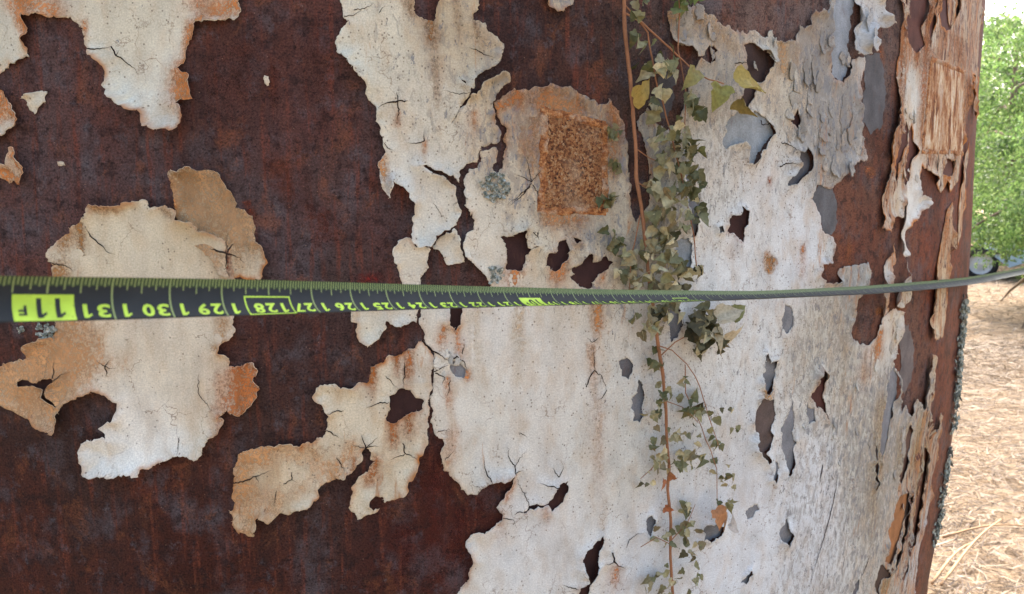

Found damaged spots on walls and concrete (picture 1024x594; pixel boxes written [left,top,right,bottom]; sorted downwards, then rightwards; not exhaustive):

crack [86,46,137,73]
peeling [0,0,241,136]
corrosion [174,60,192,101]
corrosion [899,4,944,123]
peeling [46,166,268,280]
corrosion [163,167,258,275]
peeling [229,0,985,594]
peeling [0,316,258,480]
crack [327,362,415,472]
crack [422,340,467,397]
corrosion [232,446,271,525]
crack [484,433,563,526]